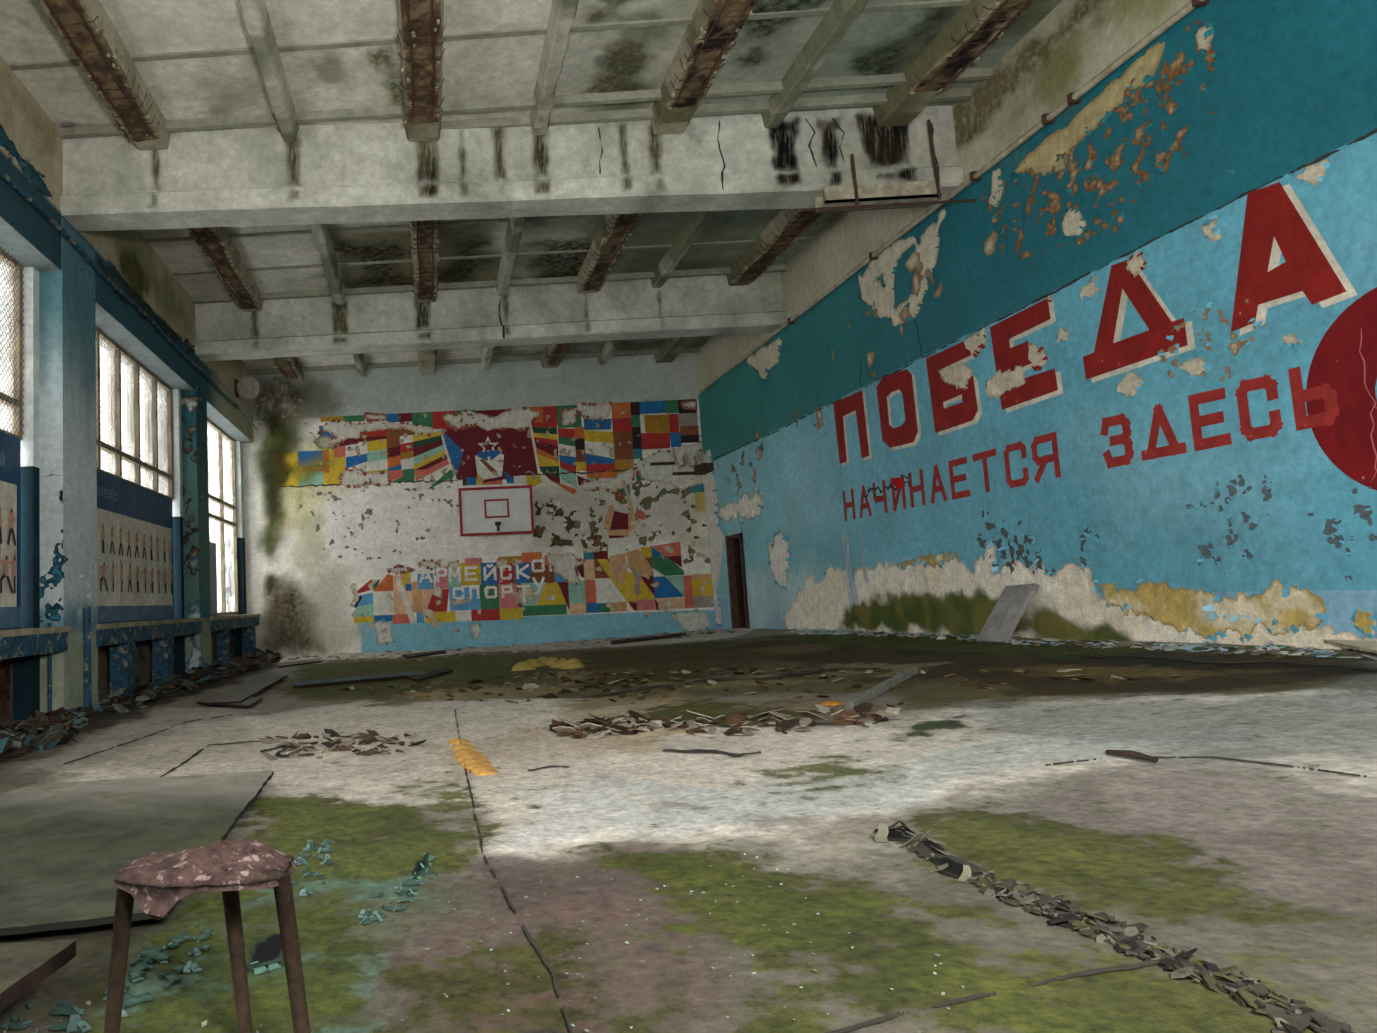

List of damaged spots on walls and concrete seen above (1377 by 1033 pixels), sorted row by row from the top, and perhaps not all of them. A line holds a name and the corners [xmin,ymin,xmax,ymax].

damp [769,119,799,184]
damp [817,119,841,185]
damp [856,115,915,180]
peeling [982,19,1216,267]
peeling [849,209,946,335]
crack [1359,329,1377,482]
peeling [256,357,829,646]
damp [269,584,311,650]
peeling [764,511,1377,650]
crack [1153,756,1367,777]
crack [454,709,573,1033]
crack [824,826,1355,1033]